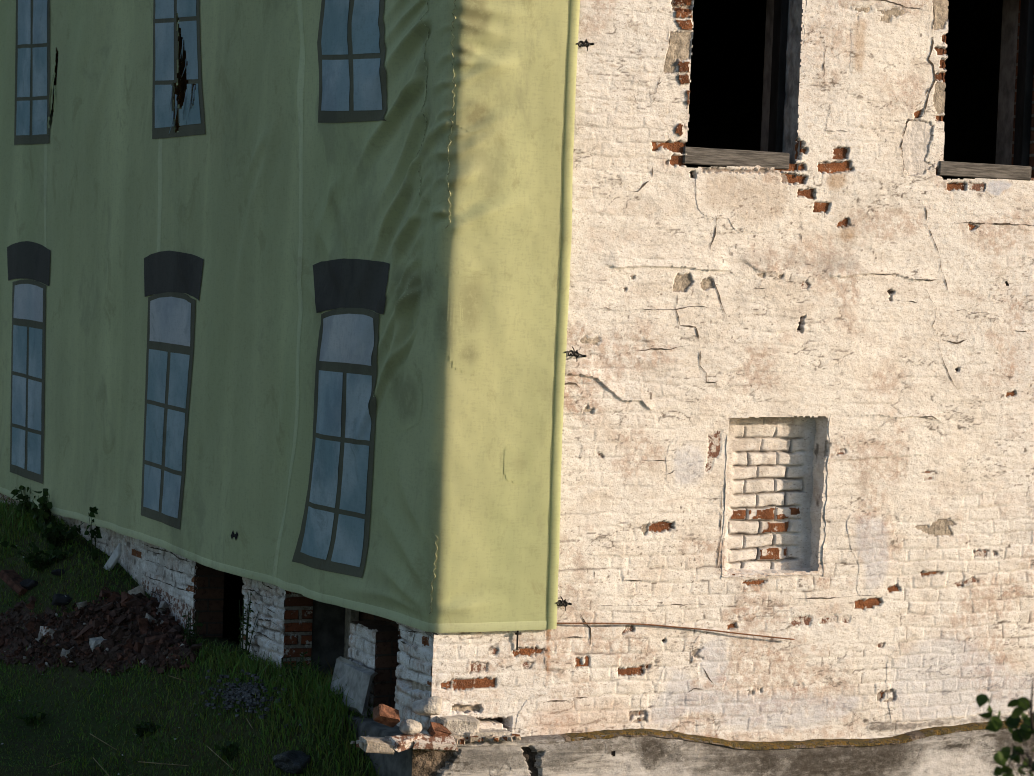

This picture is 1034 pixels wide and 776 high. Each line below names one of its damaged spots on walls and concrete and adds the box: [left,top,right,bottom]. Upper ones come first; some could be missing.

spalling [664,0,693,104]
crack [881,0,936,176]
spalling [933,0,949,121]
flaking render [652,124,685,166]
flaking render [775,139,829,212]
flaking render [817,147,852,173]
crack [639,280,727,386]
crack [871,208,1034,390]
flaking render [642,521,672,535]
flaking render [427,677,495,690]
leakage [437,626,1034,776]
crack [521,747,538,776]